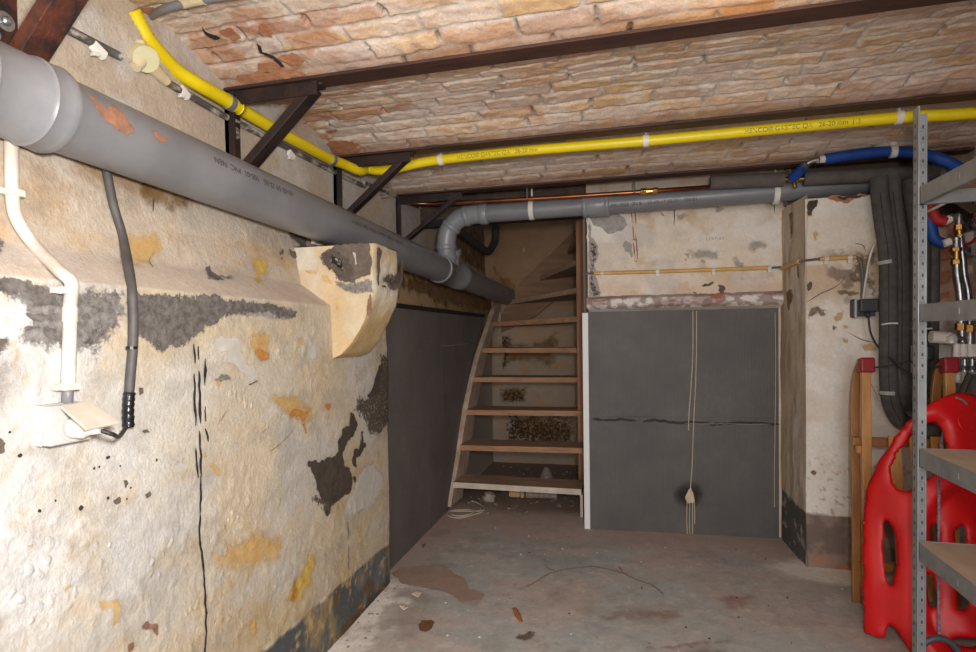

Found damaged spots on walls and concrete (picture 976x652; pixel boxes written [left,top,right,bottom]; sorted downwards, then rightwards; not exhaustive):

damp [502,335,557,369]
damp [501,388,525,402]
peeling [308,352,389,517]
damp [505,415,575,442]
crack [592,418,779,426]
crack [193,344,228,652]